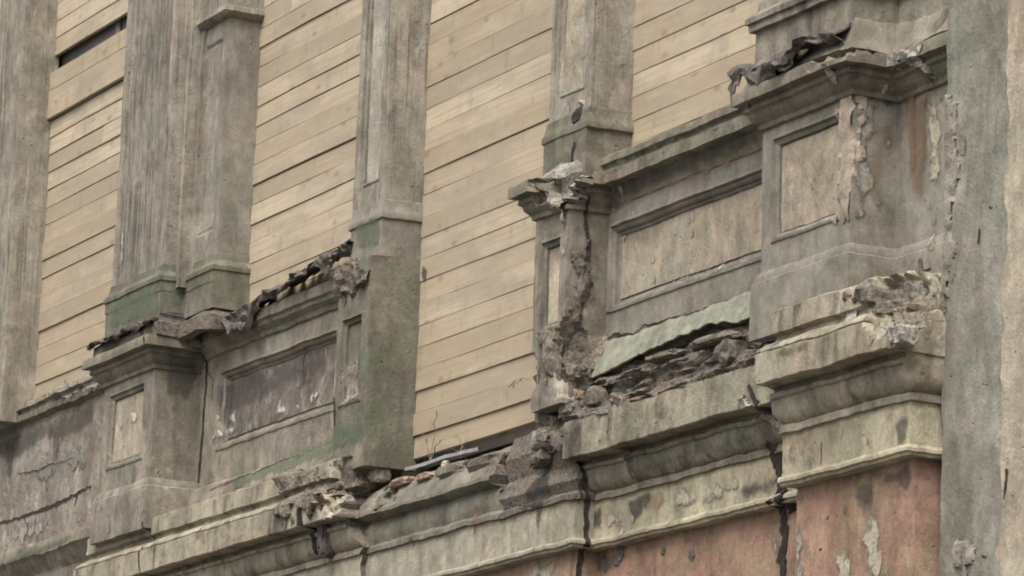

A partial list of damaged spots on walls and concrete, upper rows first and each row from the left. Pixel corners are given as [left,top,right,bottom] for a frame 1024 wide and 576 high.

spalling [831,84,888,225]
spalling [531,174,589,225]
spalling [842,44,965,345]
spalling [529,238,769,470]
crack [198,351,335,490]
crack [0,486,91,540]
spalling [270,465,350,531]
crack [747,384,797,576]
peeling [836,553,850,576]
peeling [860,517,889,576]
spalling [951,539,988,576]